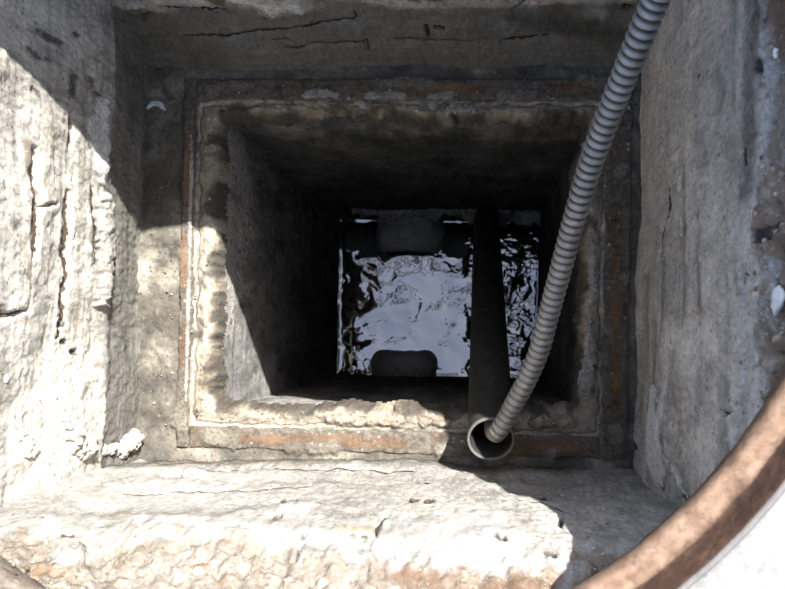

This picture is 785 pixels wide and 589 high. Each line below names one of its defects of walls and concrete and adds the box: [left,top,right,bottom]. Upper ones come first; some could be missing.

crack [164,4,225,12]
crack [184,12,369,50]
crack [65,115,73,147]
crack [28,148,68,338]
crack [89,189,97,263]
crack [660,188,672,258]
crack [123,468,430,506]